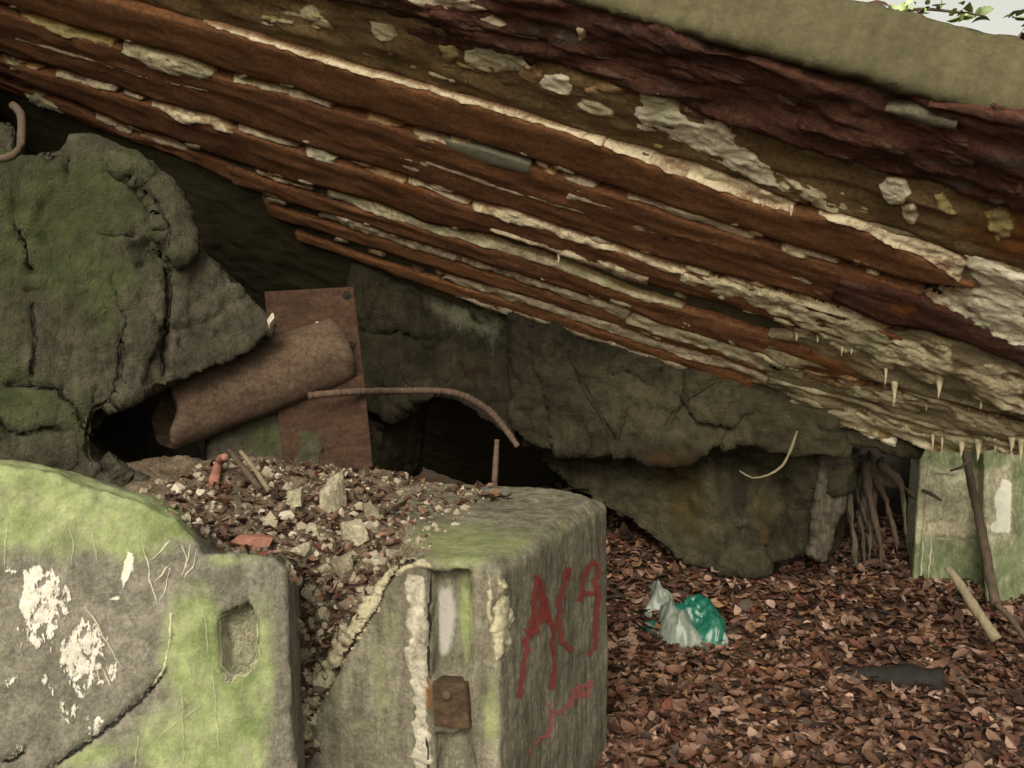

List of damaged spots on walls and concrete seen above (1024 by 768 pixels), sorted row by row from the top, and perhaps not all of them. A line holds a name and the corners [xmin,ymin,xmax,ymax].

damp [113,119,189,150]
damp [151,99,339,164]
peeling [385,0,1024,209]
crack [13,224,33,270]
damp [255,166,1024,462]
crack [9,310,101,430]
spalling [307,387,520,486]
peeling [990,479,1012,533]
peeling [112,551,134,600]
peeling [6,565,117,735]
crack [425,573,433,680]
crack [423,738,431,768]